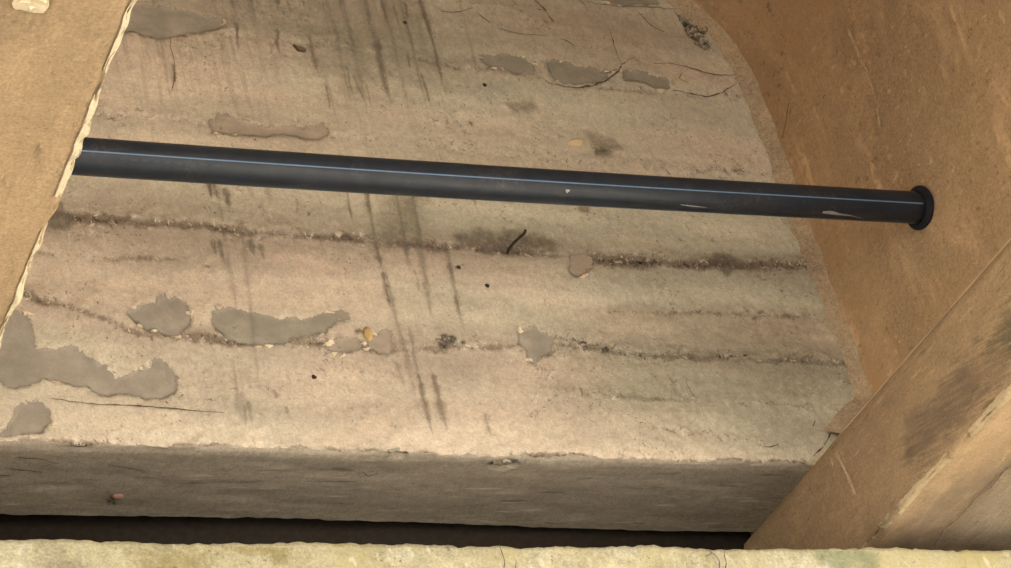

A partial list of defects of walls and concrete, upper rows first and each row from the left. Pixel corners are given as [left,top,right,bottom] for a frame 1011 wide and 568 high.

peeling [103,0,228,74]
crack [443,0,574,46]
crack [543,1,737,97]
spalling [677,14,709,50]
peeling [477,53,673,93]
spalling [55,89,101,198]
peeling [0,223,179,400]
peeling [127,294,195,339]
peeling [211,306,396,357]
peeling [516,324,555,366]
peeling [0,399,57,437]